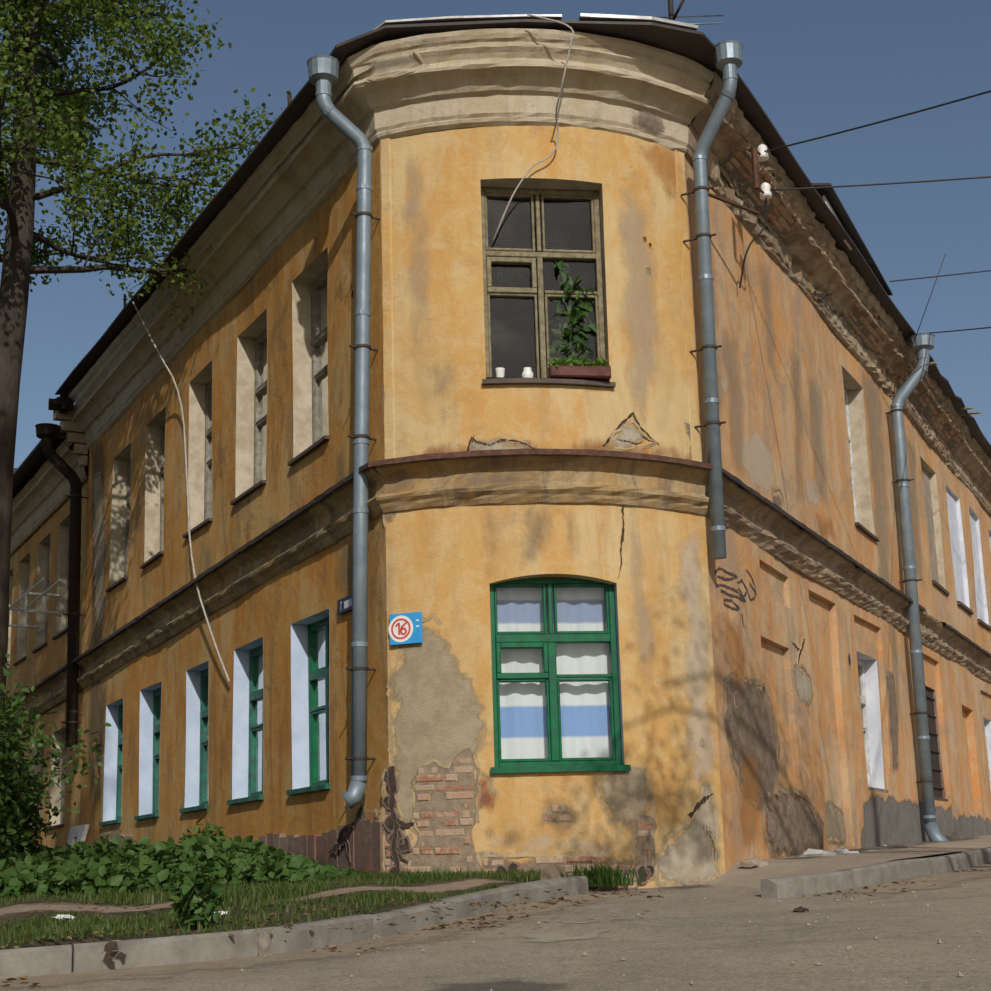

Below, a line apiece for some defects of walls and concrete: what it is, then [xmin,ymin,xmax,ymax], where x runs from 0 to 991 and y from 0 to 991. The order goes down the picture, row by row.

flaking render [720,150,799,236]
spalling [841,298,892,354]
peeling [466,437,541,451]
spalling [604,418,658,453]
spalling [895,358,965,459]
crack [617,506,625,579]
peeling [354,538,723,890]
spalling [794,663,814,708]
peeling [723,670,846,859]